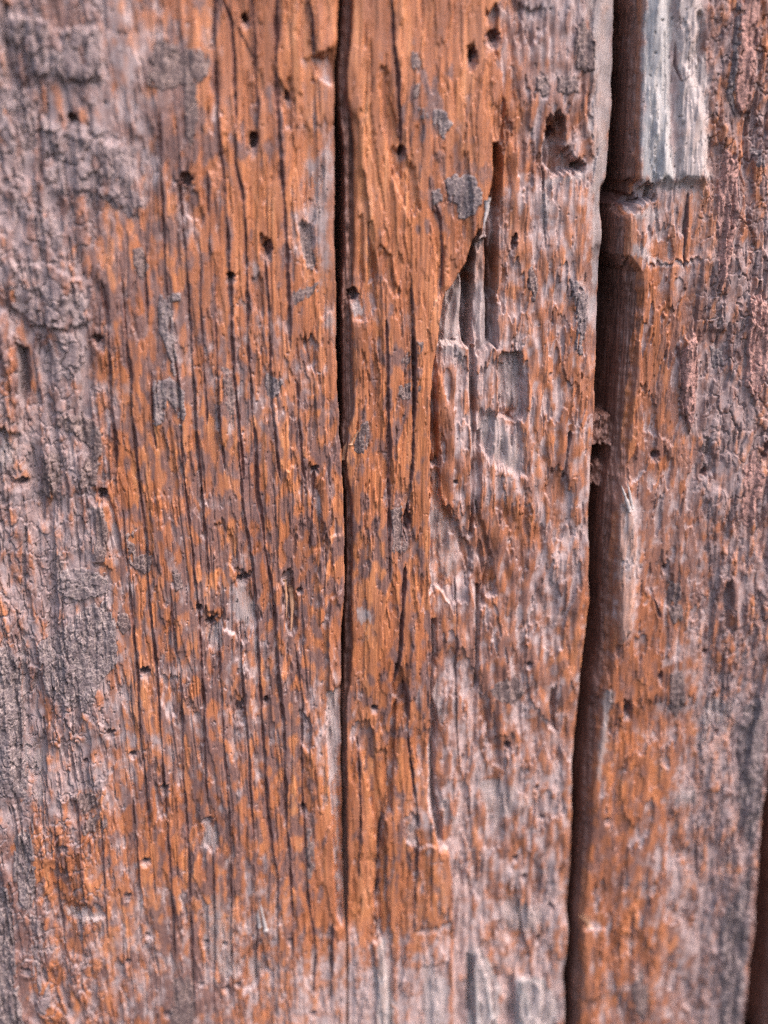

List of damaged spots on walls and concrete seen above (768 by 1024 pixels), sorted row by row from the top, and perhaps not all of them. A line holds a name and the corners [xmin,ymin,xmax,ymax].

peeling [7,9,103,84]
peeling [0,87,146,219]
peeling [35,213,66,251]
peeling [9,279,90,382]
peeling [40,453,62,498]
peeling [55,413,103,491]
peeling [36,506,131,713]
peeling [0,645,29,799]
peeling [74,791,107,836]
peeling [0,819,51,1024]